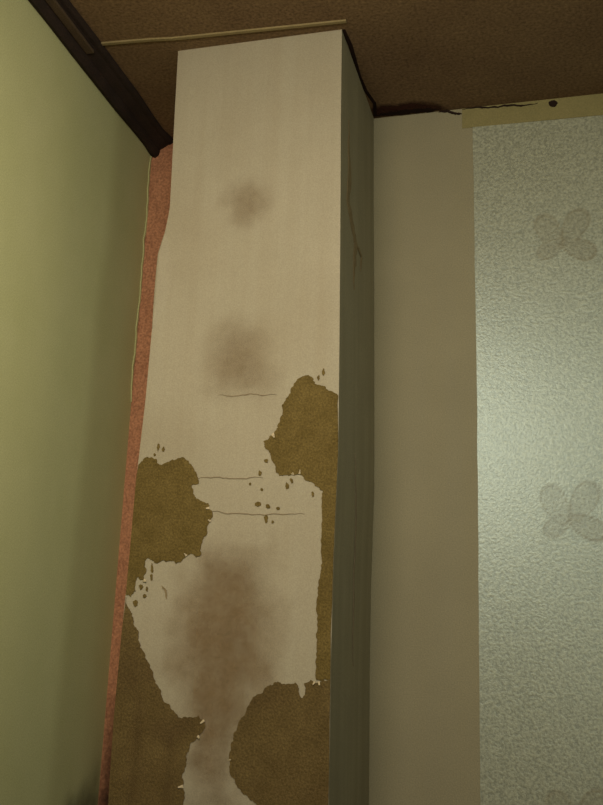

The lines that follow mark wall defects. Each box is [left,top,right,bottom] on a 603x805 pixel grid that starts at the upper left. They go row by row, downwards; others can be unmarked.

crack [342,29,537,117]
crack [347,121,362,290]
flaking render [98,143,173,805]
peeling [313,474,337,685]